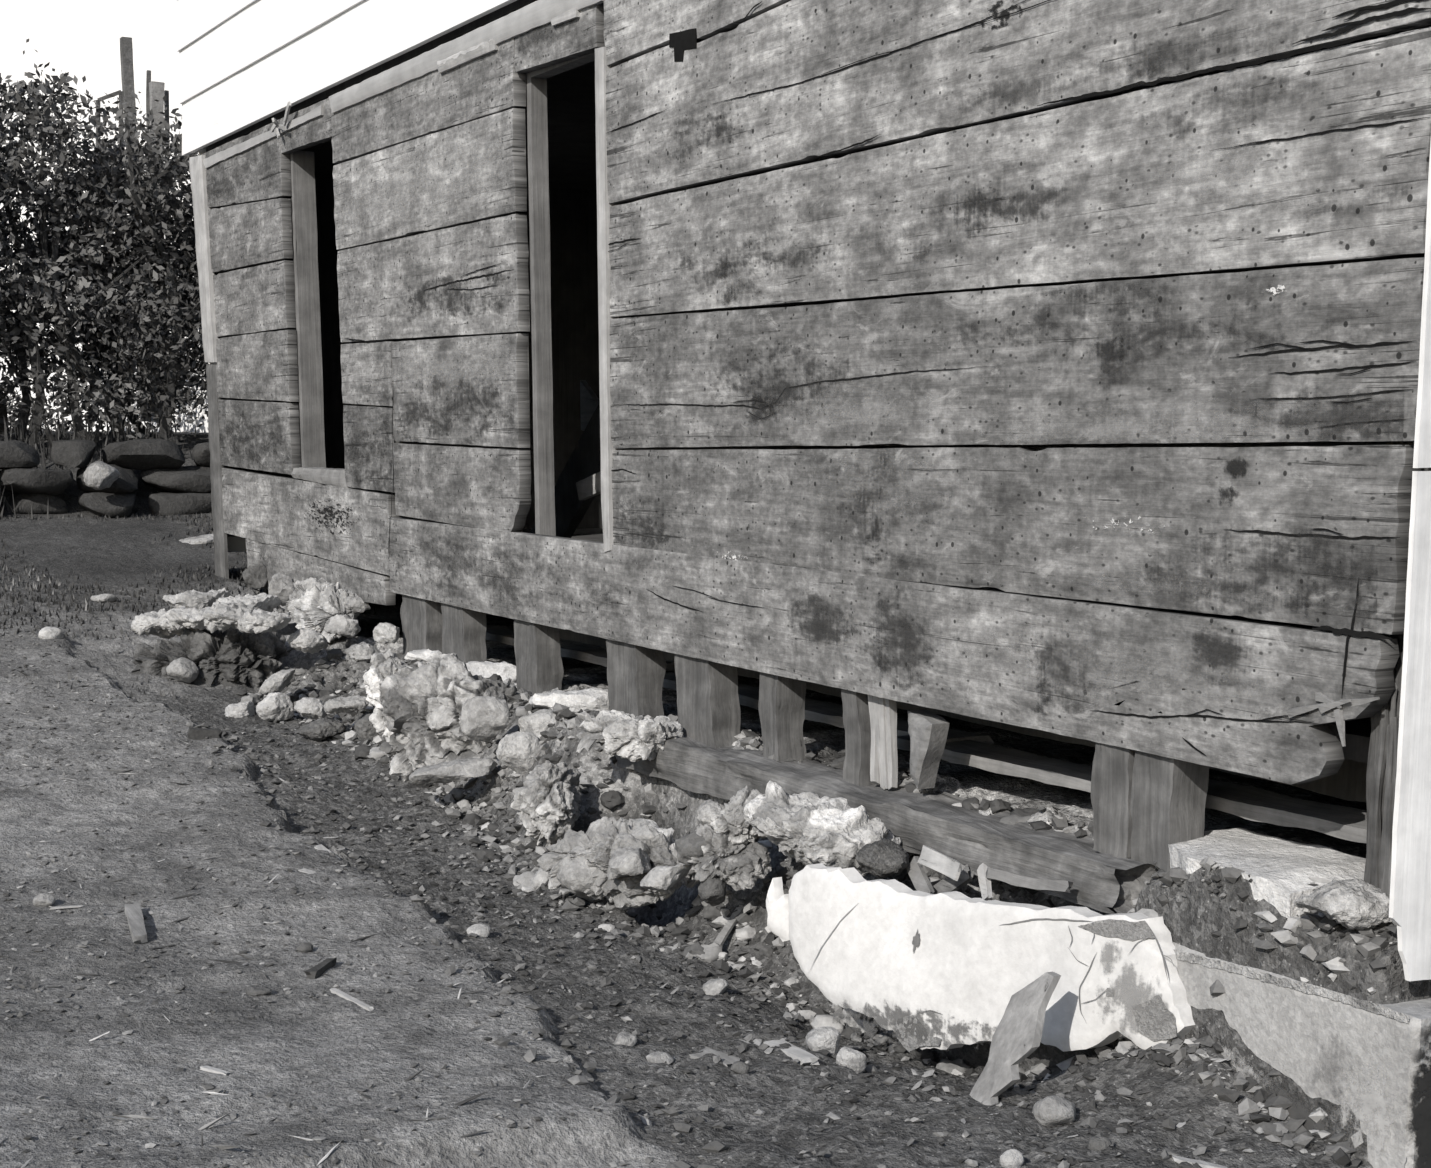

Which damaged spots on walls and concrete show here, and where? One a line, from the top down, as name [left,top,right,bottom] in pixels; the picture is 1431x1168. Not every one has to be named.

crack [1037,0,1431,106]
crack [818,134,881,157]
damp [1096,285,1199,385]
crack [1228,340,1416,429]
damp [791,597,848,644]
damp [865,600,932,687]
crack [1090,709,1309,756]
damp [1409,1058,1431,1168]